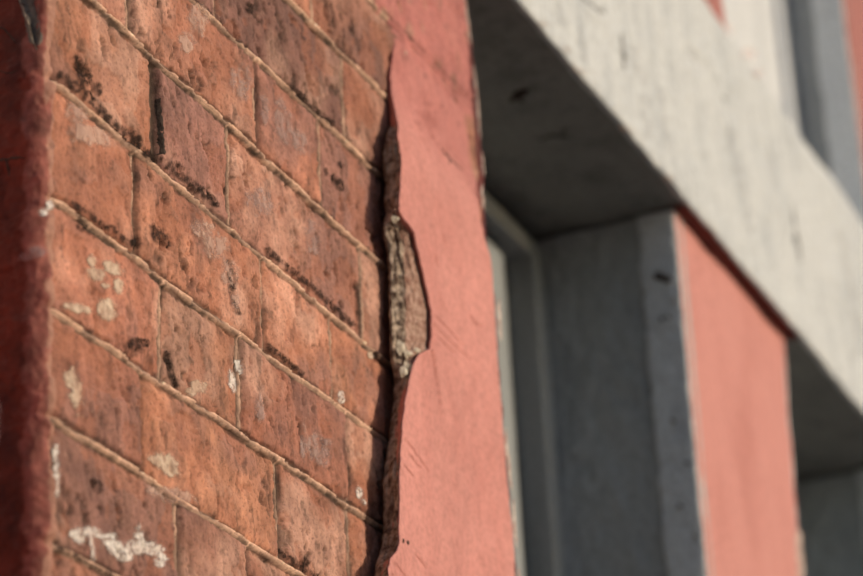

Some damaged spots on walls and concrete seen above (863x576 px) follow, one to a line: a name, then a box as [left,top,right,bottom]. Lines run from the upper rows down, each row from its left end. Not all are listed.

peeling [102,279,123,293]
peeling [64,303,91,313]
spalling [375,102,427,576]
leakage [228,360,241,392]
leakage [69,526,166,567]